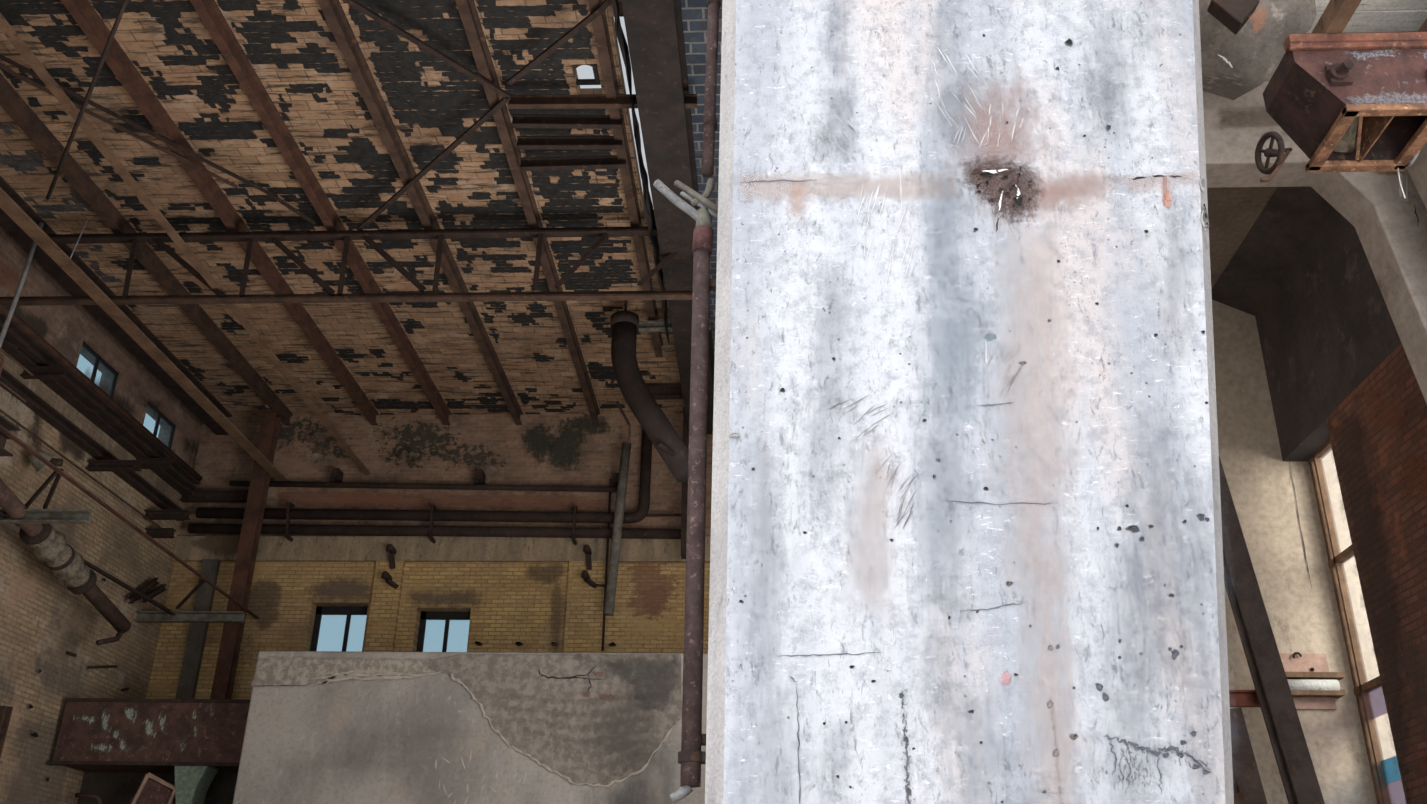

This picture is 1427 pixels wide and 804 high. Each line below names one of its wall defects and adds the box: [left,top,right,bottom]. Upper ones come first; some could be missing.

peeling [0,0,123,120]
peeling [91,0,277,157]
peeling [0,151,93,219]
peeling [70,141,261,287]
peeling [217,0,638,363]
spalling [965,159,1038,231]
peeling [276,349,627,481]
damp [521,415,610,470]
peeling [253,641,682,788]
crack [538,666,602,693]
crack [899,689,915,804]
crack [1104,731,1210,795]